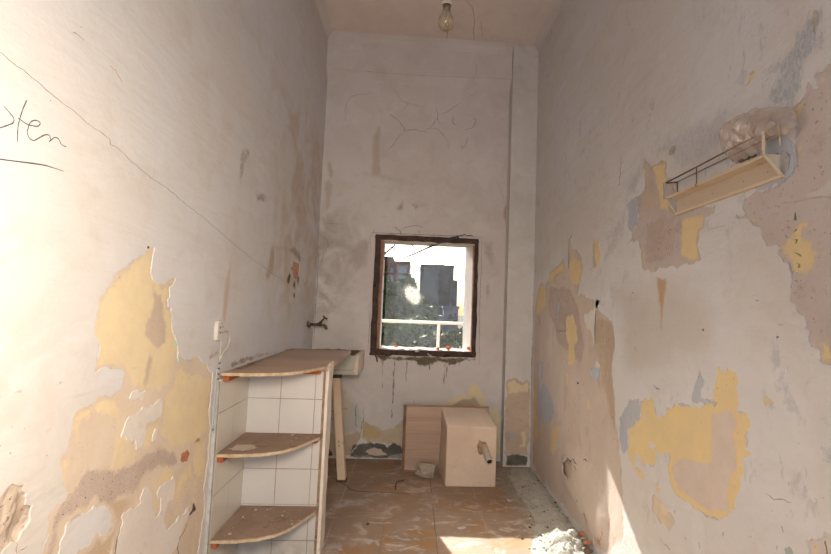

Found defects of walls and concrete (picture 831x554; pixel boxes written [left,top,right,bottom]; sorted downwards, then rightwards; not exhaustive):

peeling [628,145,716,272]
flaking render [736,7,831,365]
flaking render [0,484,31,553]
peeling [40,246,212,554]
peeling [328,408,403,458]
peeling [446,240,752,554]